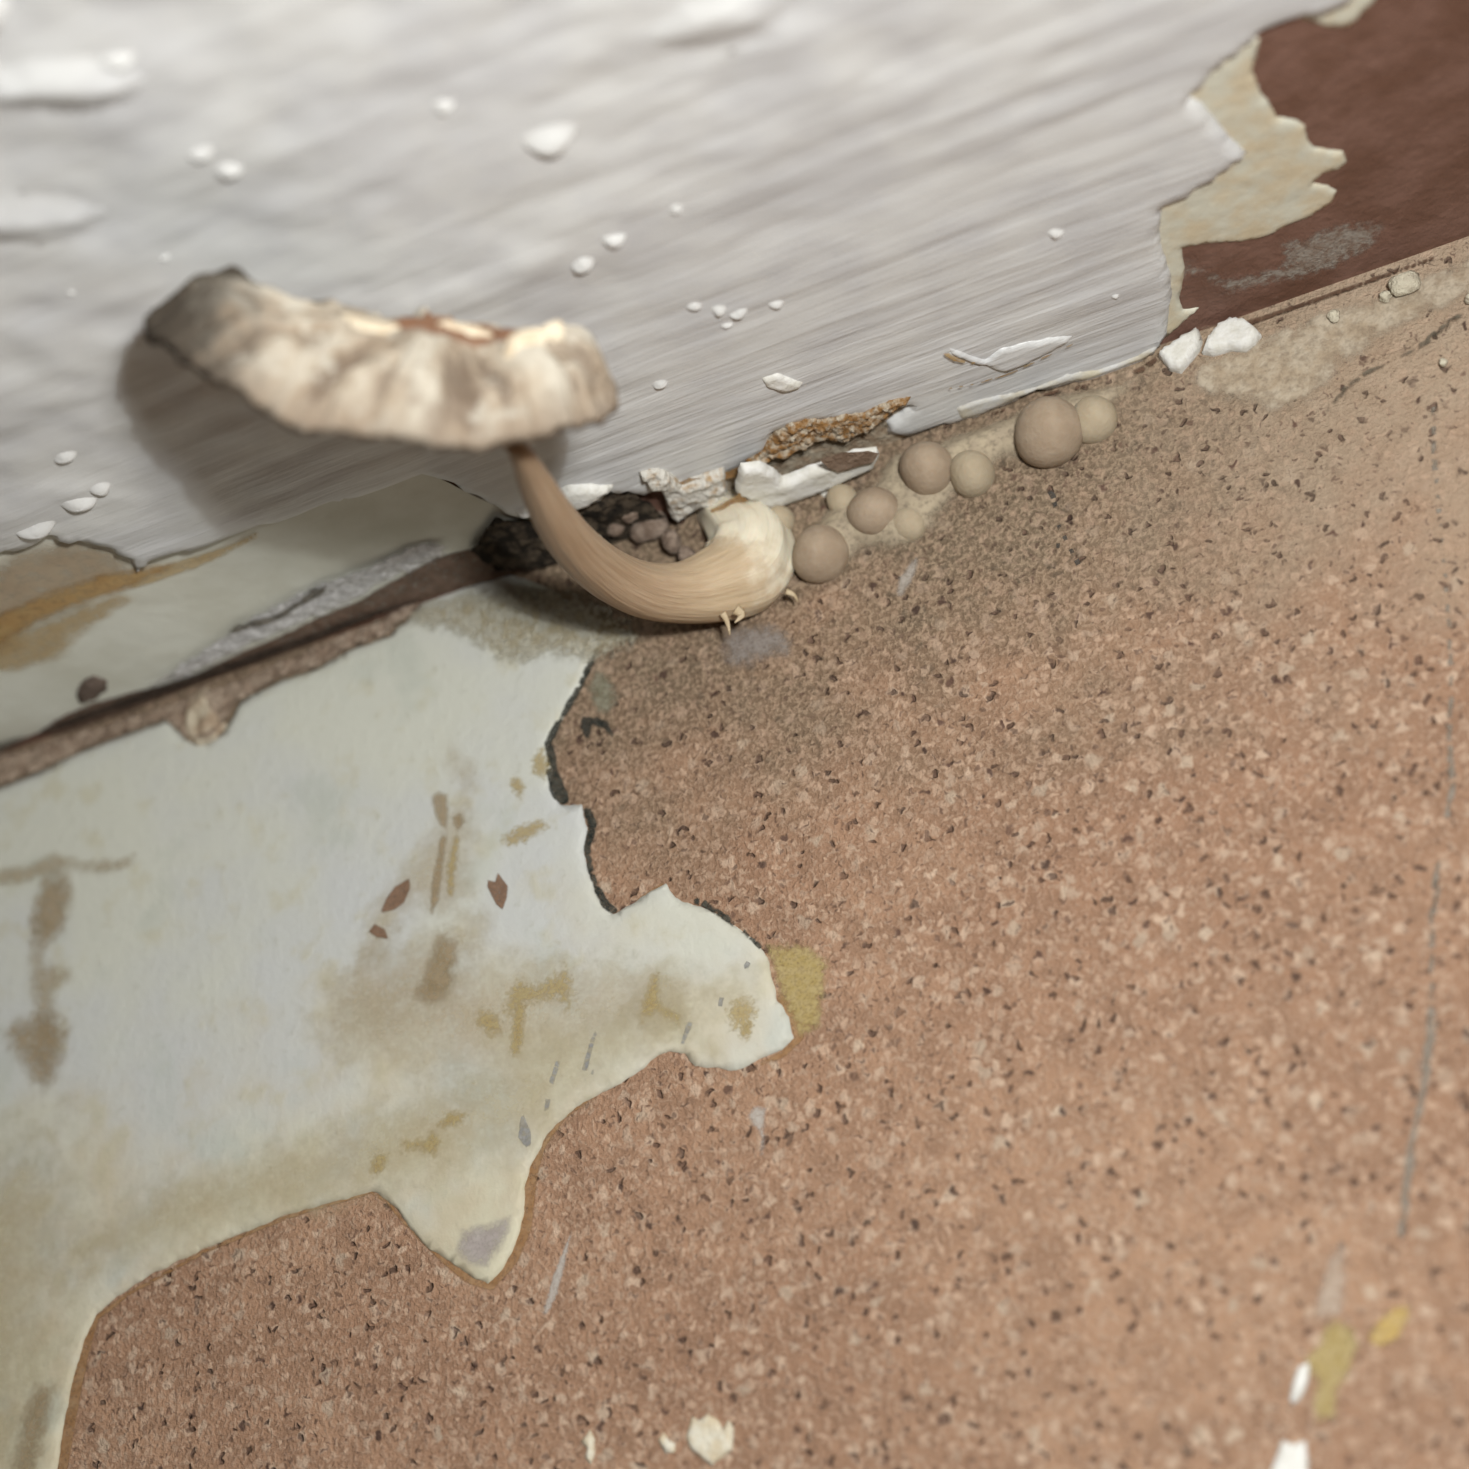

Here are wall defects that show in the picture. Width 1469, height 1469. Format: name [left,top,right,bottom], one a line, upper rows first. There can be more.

peeling [944,0,1469,418]
water stain [0,543,126,620]
flaking render [560,447,879,544]
crack [1432,407,1441,513]
crack [1442,560,1455,817]
water stain [0,858,69,941]
peeling [0,474,803,1469]
crack [1398,864,1440,1236]